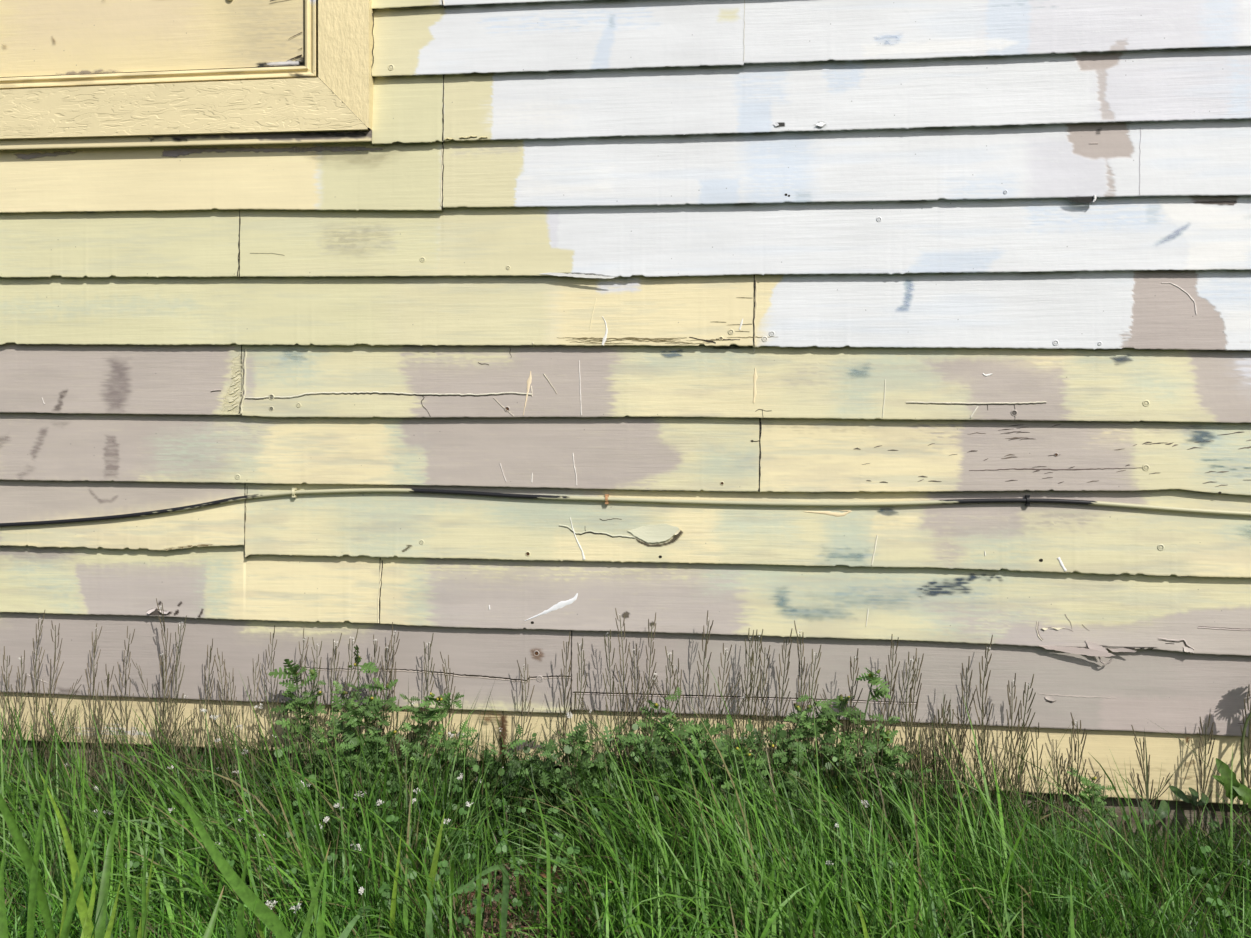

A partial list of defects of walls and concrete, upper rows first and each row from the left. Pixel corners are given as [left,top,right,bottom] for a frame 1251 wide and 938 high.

crack [211,349,532,417]
crack [906,401,1251,487]
crack [559,518,635,539]
spalling [146,601,182,615]